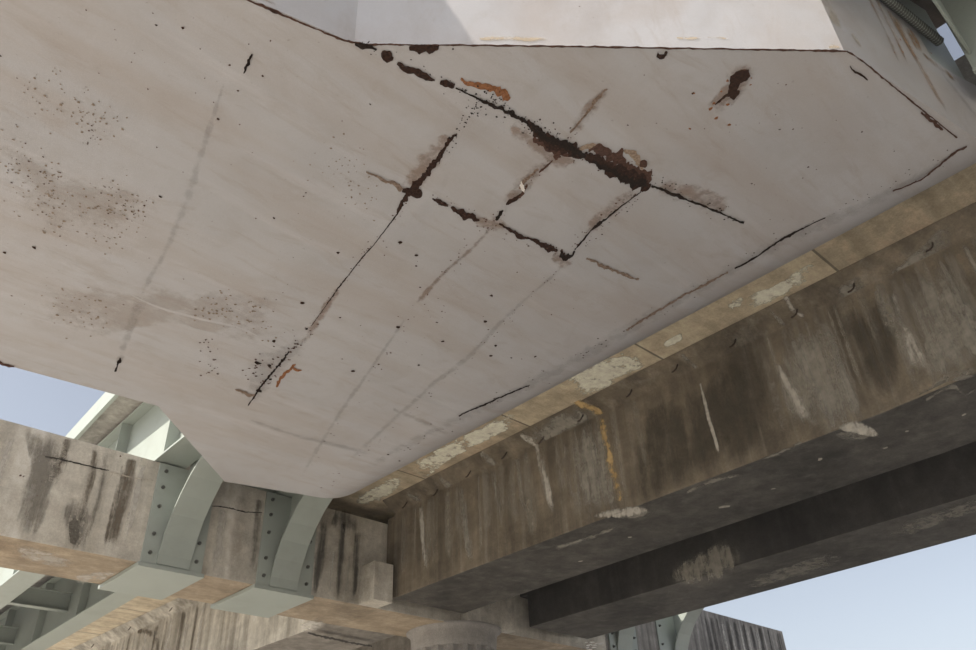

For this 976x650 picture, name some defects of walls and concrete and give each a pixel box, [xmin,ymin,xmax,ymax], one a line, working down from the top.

corrosion [247,0,958,138]
crack [311,43,744,326]
crack [893,146,967,192]
crack [626,218,825,331]
corrosion [194,289,302,406]
peeling [569,354,642,393]
damp [778,325,876,436]
damp [23,439,68,528]
damp [106,460,136,539]
peeling [358,478,400,504]
peeling [417,416,512,475]
corrosion [599,419,645,518]